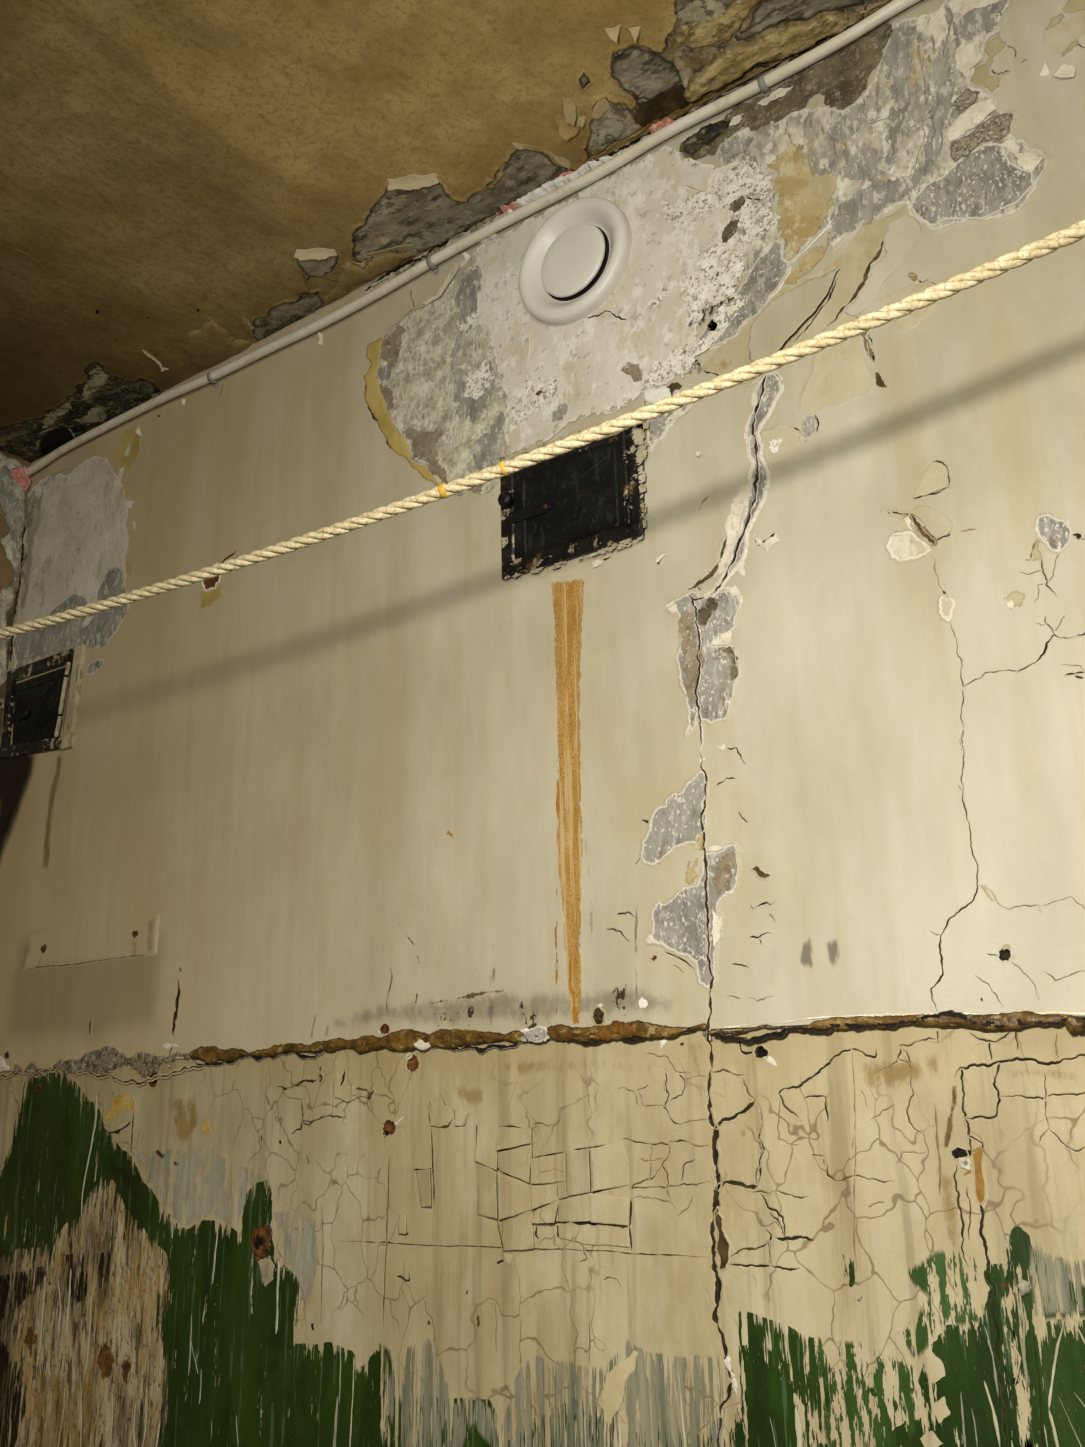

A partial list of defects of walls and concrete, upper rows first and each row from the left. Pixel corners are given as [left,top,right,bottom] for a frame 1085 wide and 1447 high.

flaking render [183,0,1055,500]
flaking render [0,424,142,736]
peeling [880,458,977,564]
flaking render [1003,512,1085,611]
rust [552,579,584,1024]
peeling [639,744,777,1004]
crack [605,359,1085,1447]
crack [275,1066,470,1136]
crack [318,1204,326,1325]
crack [382,1155,391,1330]
peeling [0,1071,1085,1447]
crack [585,1318,593,1366]